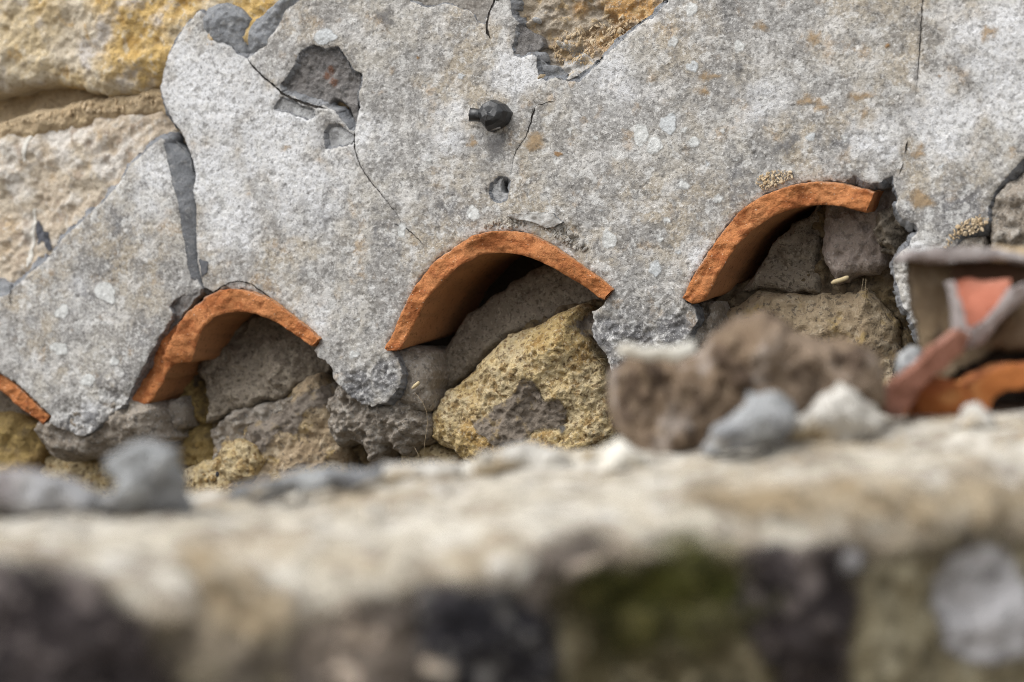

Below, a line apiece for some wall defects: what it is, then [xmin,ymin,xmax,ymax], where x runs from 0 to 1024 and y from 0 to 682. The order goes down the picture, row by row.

spalling [514,0,668,80]
crack [248,60,324,108]
spalling [277,46,362,124]
crack [512,101,554,164]
crack [354,133,424,245]
spalling [168,259,208,334]
spalling [615,339,697,363]